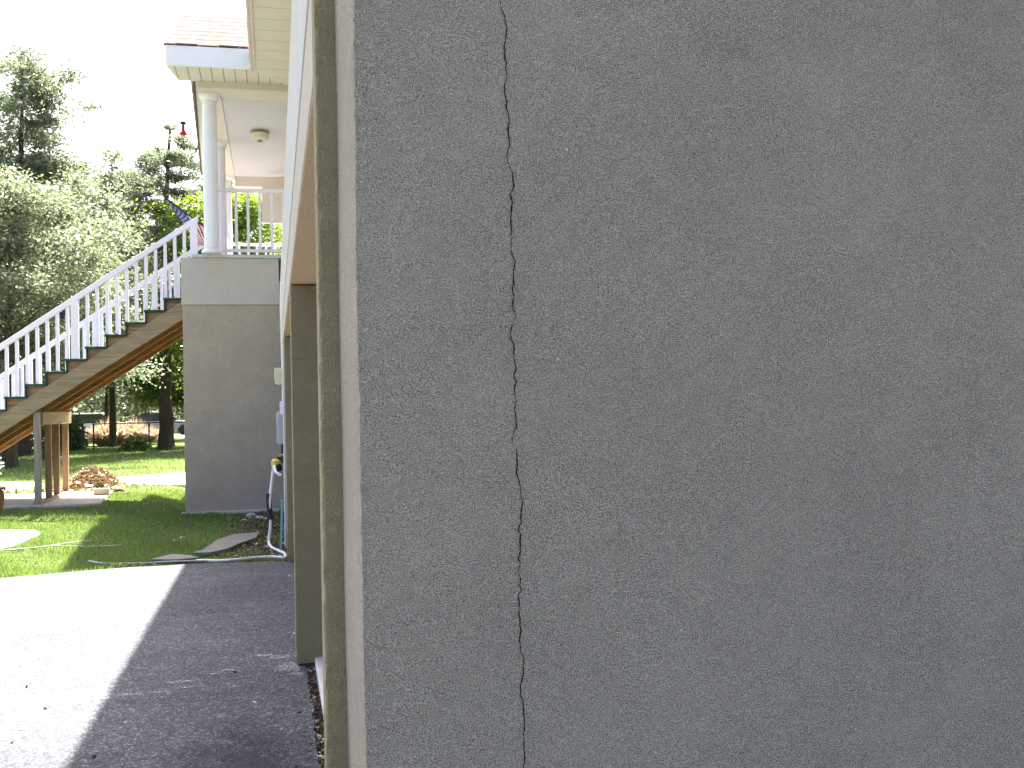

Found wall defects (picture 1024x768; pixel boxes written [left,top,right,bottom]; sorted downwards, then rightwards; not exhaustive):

crack [500,0,525,768]